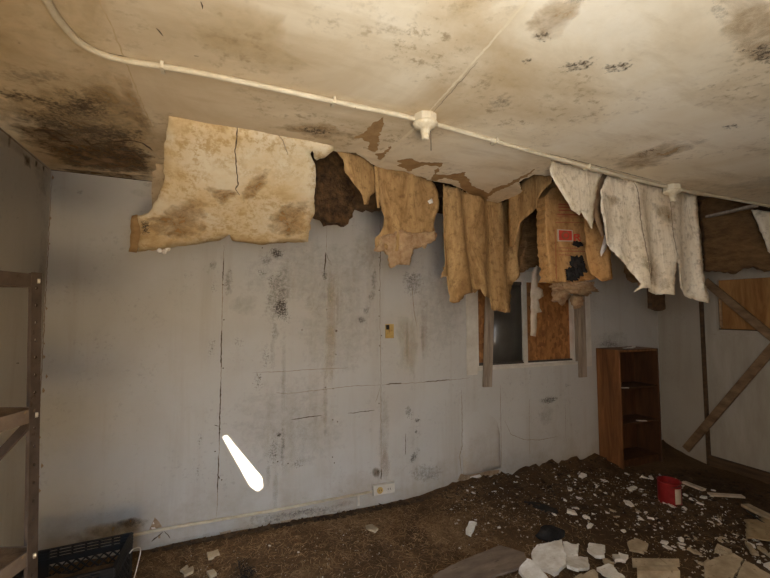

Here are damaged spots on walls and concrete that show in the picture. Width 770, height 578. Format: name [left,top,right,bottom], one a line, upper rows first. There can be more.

damp [1,0,155,172]
crack [232,128,240,194]
spalling [129,215,141,253]